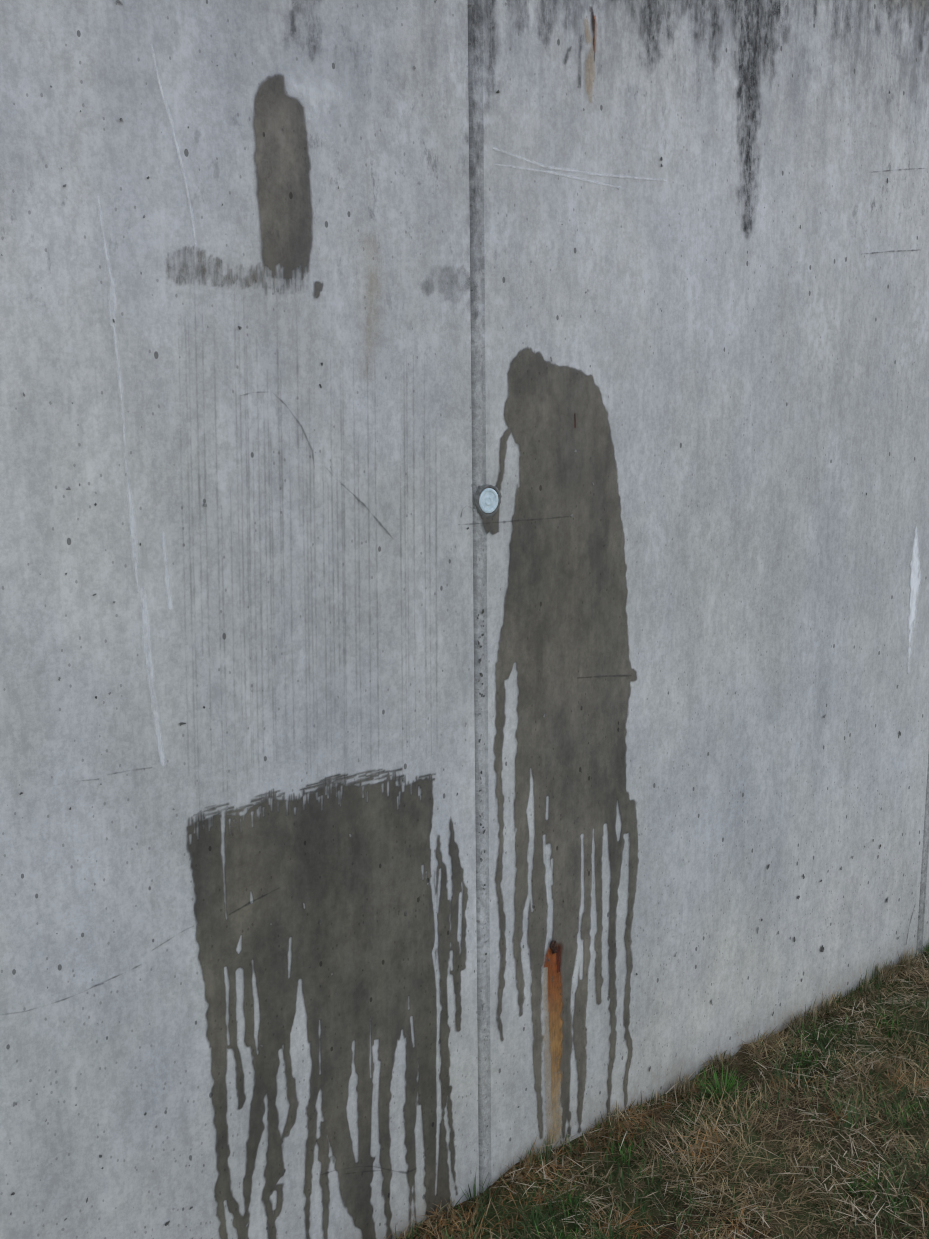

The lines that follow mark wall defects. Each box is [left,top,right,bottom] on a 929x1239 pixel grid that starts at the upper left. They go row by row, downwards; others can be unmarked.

leakage [228,75,333,298]
leakage [687,0,787,231]
leakage [482,348,639,1139]
leakage [187,768,468,1239]
corrosion [544,941,563,1144]